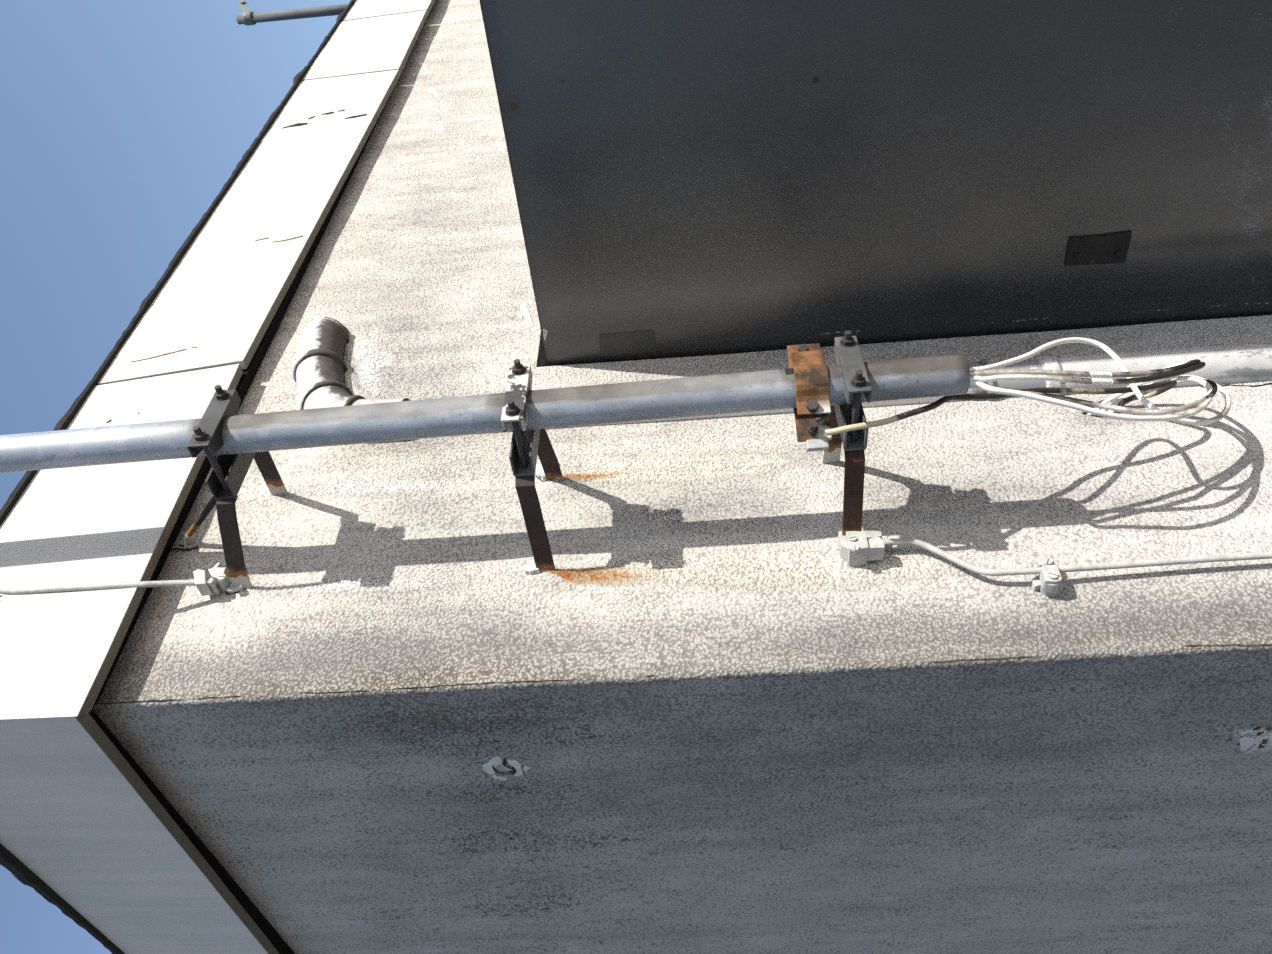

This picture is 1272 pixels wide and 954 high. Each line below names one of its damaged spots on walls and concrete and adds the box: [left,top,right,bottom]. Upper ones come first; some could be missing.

corrosion [548,568,633,582]
spalling [1236,725,1272,752]
spalling [482,757,531,781]